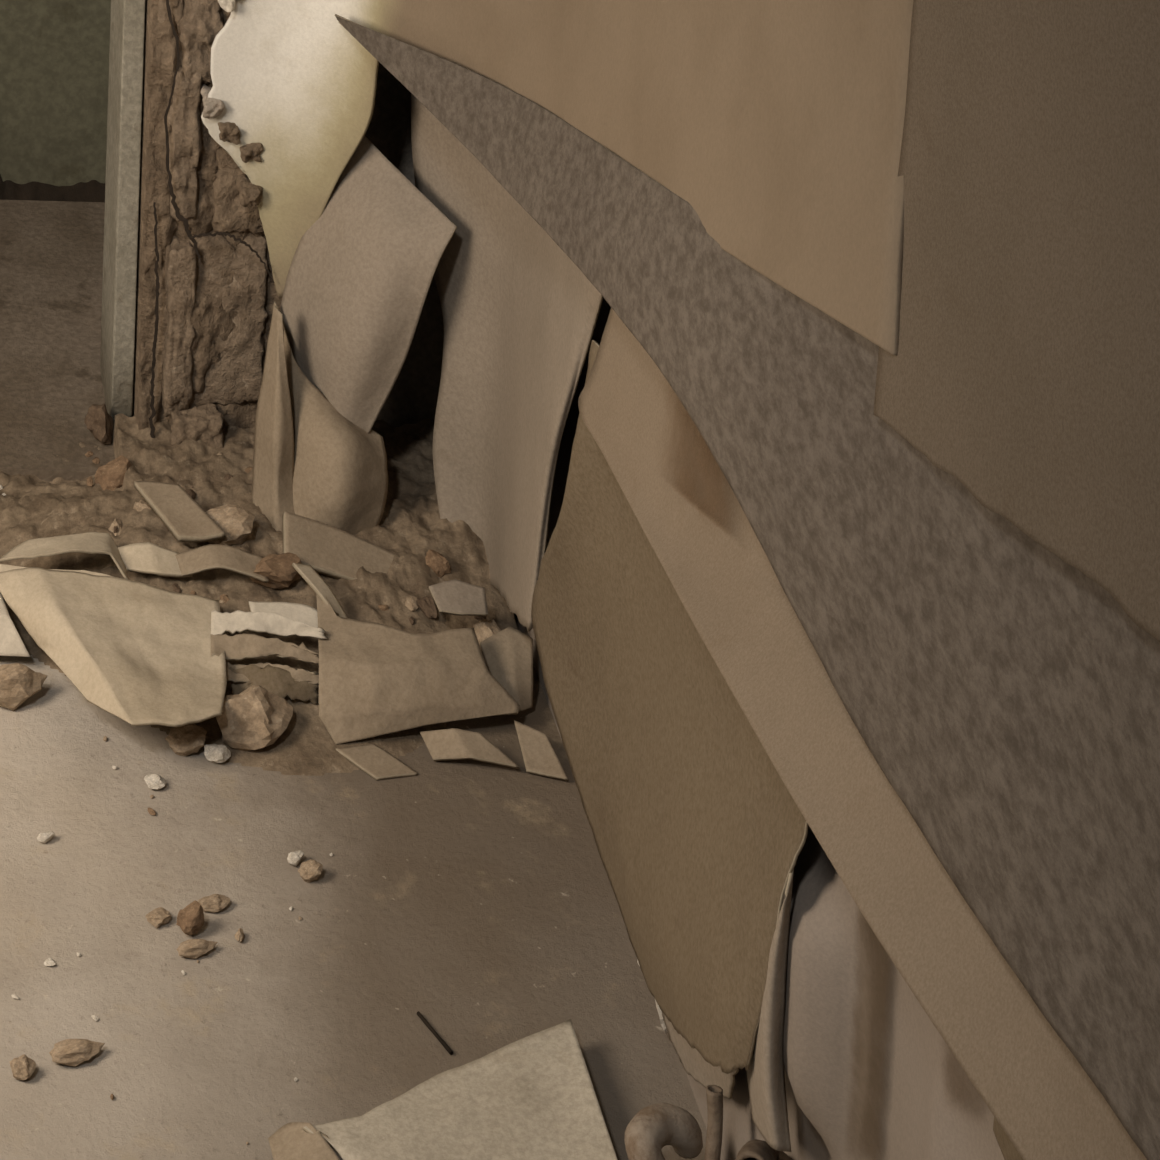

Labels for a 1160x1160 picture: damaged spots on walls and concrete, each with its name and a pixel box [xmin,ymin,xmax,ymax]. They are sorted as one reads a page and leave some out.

spalling [133,0,282,449]